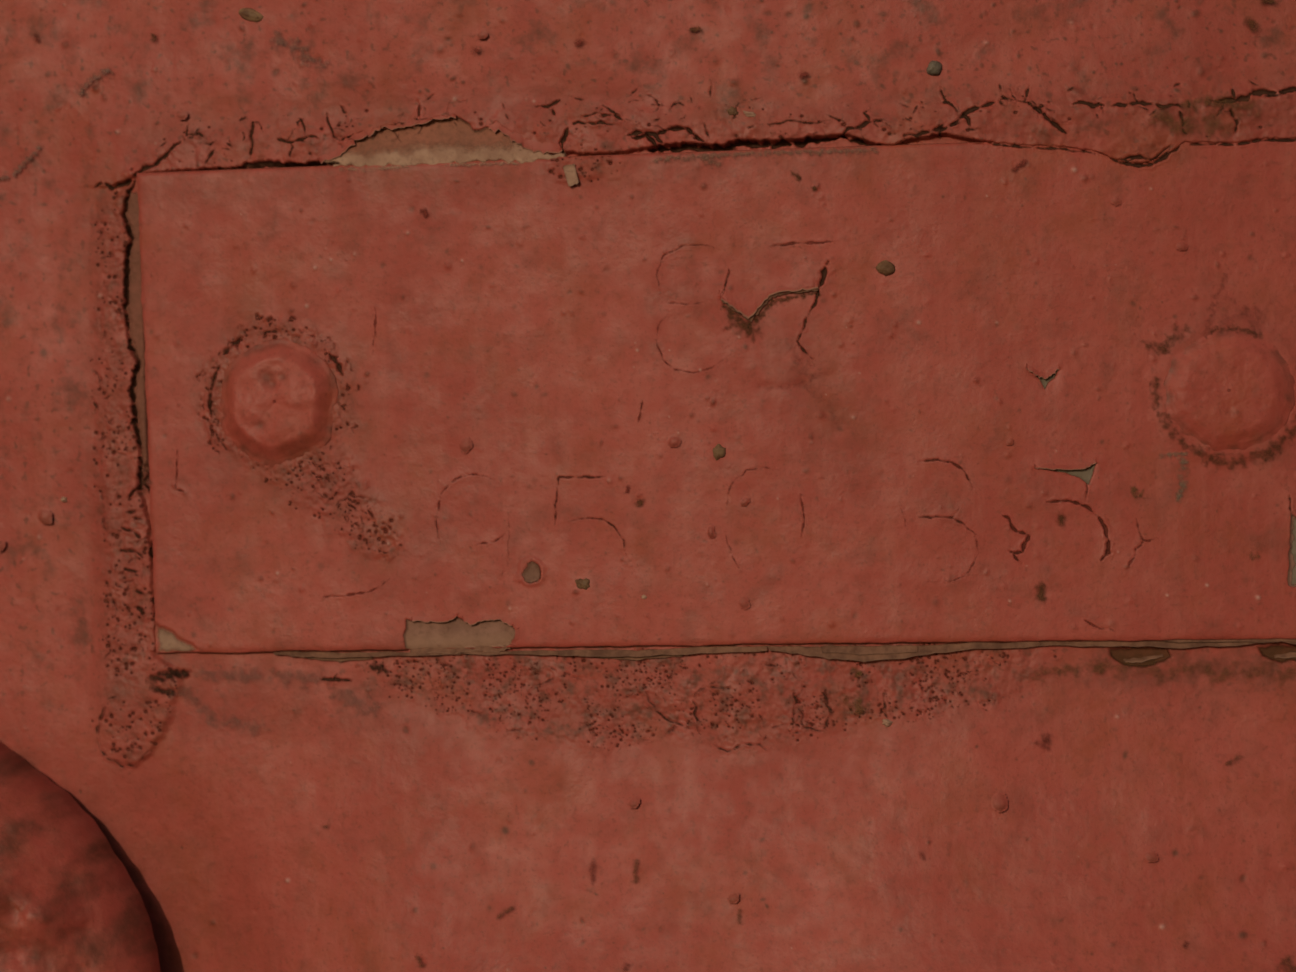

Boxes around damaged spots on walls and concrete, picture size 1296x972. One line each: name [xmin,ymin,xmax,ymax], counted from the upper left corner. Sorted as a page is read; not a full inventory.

peeling [318,112,579,186]
crack [506,81,1296,168]
crack [774,241,829,353]
crack [93,107,359,657]
peeling [1288,502,1296,587]
peeling [273,613,1296,667]